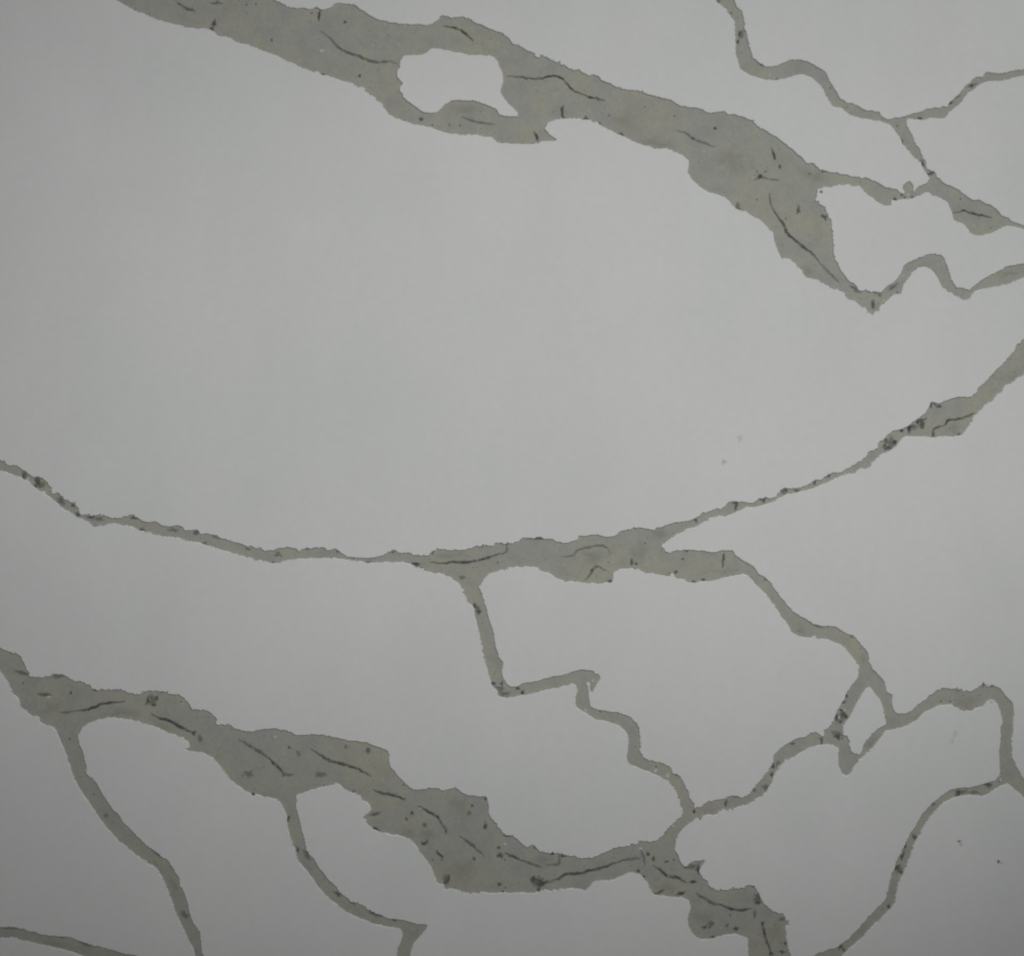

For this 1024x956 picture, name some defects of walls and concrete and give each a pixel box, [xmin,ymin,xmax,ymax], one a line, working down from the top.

spalling [118,0,938,314]
spalling [413,527,754,588]
spalling [0,649,790,956]